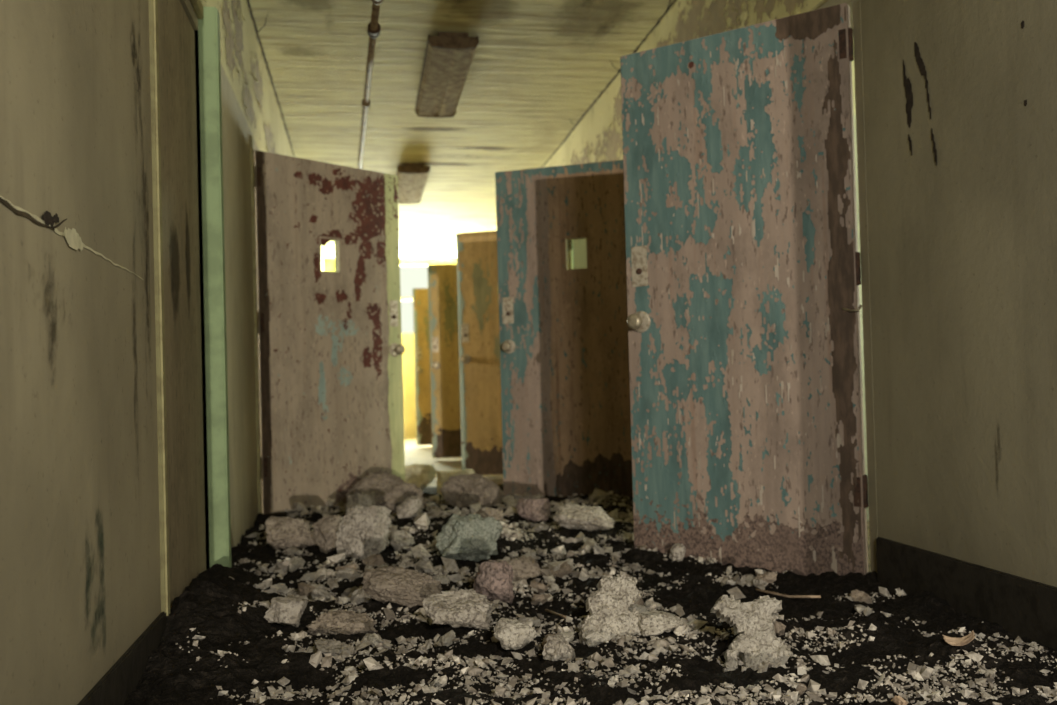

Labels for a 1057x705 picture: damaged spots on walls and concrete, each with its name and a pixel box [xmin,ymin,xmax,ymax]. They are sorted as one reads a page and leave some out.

crack [0,196,143,280]
peeling [422,277,458,350]
peeling [471,0,864,576]